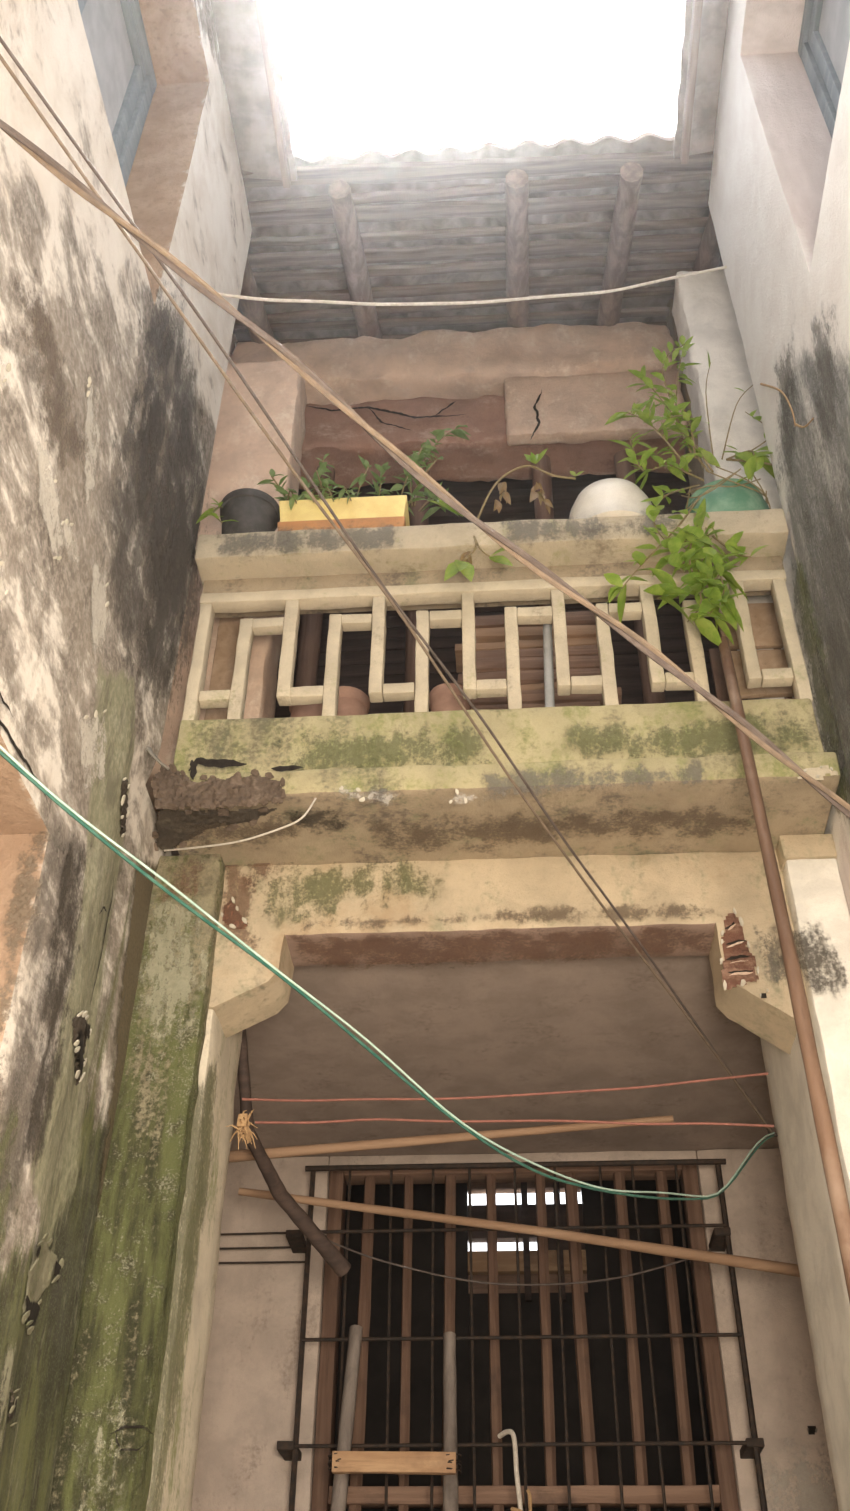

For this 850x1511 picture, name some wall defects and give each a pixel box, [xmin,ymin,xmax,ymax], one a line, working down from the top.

crack [309,400,464,430]
crack [530,390,542,440]
damp [295,483,850,811]
spalling [120,777,131,837]
spalling [146,746,286,853]
damp [265,806,755,927]
spalling [720,908,769,998]
damp [0,827,86,1247]
spalling [72,1011,92,1086]
damp [93,860,207,1242]
spalling [21,1233,64,1335]
damp [131,1064,217,1511]